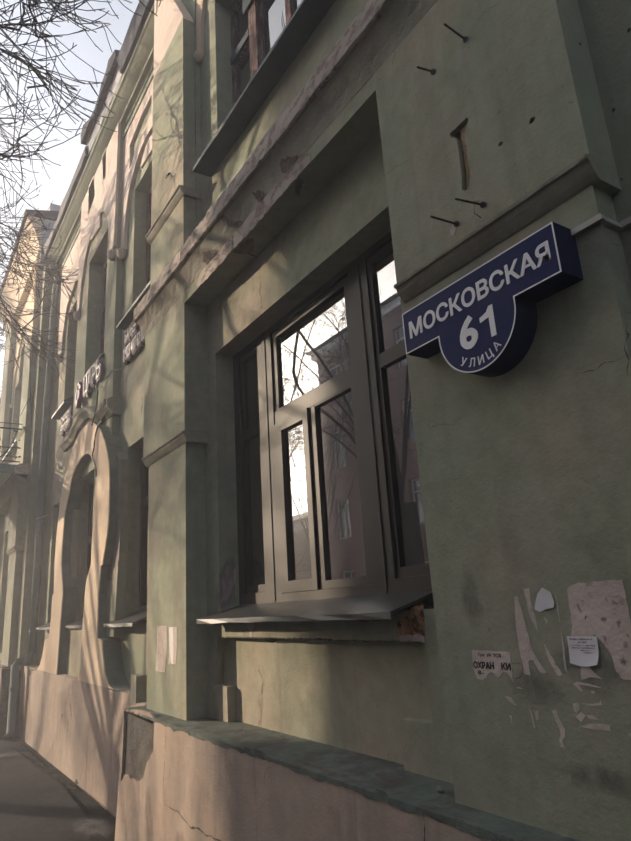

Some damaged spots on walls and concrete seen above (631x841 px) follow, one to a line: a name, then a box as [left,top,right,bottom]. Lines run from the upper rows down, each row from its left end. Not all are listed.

flaking render [124,709,157,781]
crack [163,777,221,841]